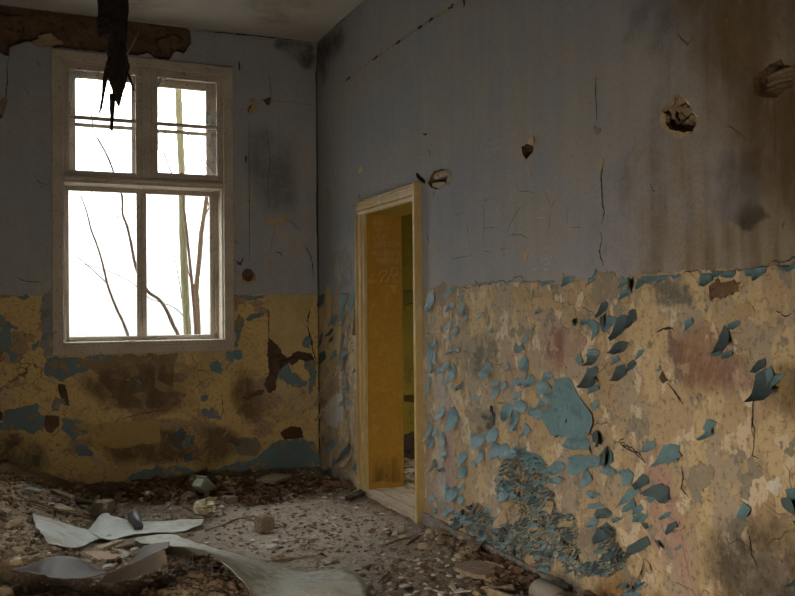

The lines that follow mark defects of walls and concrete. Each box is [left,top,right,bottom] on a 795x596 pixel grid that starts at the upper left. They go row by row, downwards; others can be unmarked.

flaking render [0,5,107,56]
flaking render [126,21,191,60]
spalling [659,94,698,138]
crack [598,167,606,266]
peeling [698,267,766,301]
peeling [31,287,109,382]
peeling [709,321,740,359]
peeling [128,293,357,480]
peeling [744,359,785,402]
leakage [103,430,185,461]
peeling [421,268,685,596]
peeling [765,476,795,524]